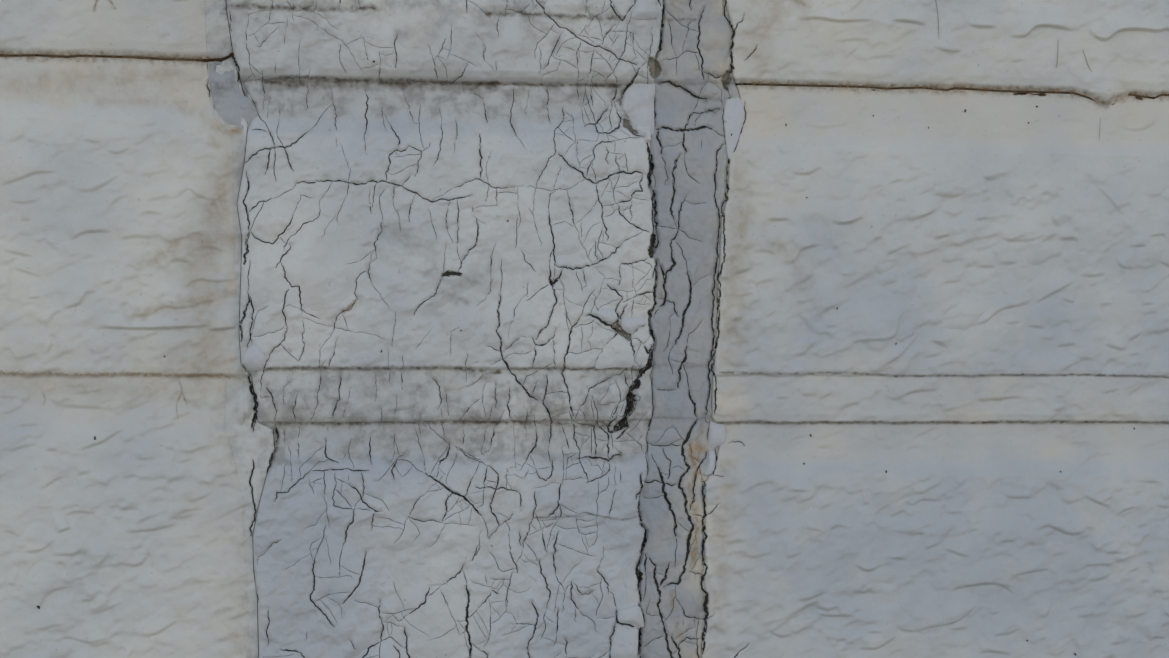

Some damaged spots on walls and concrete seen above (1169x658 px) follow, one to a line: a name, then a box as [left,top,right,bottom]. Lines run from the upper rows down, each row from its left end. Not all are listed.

crack [0,0,757,658]